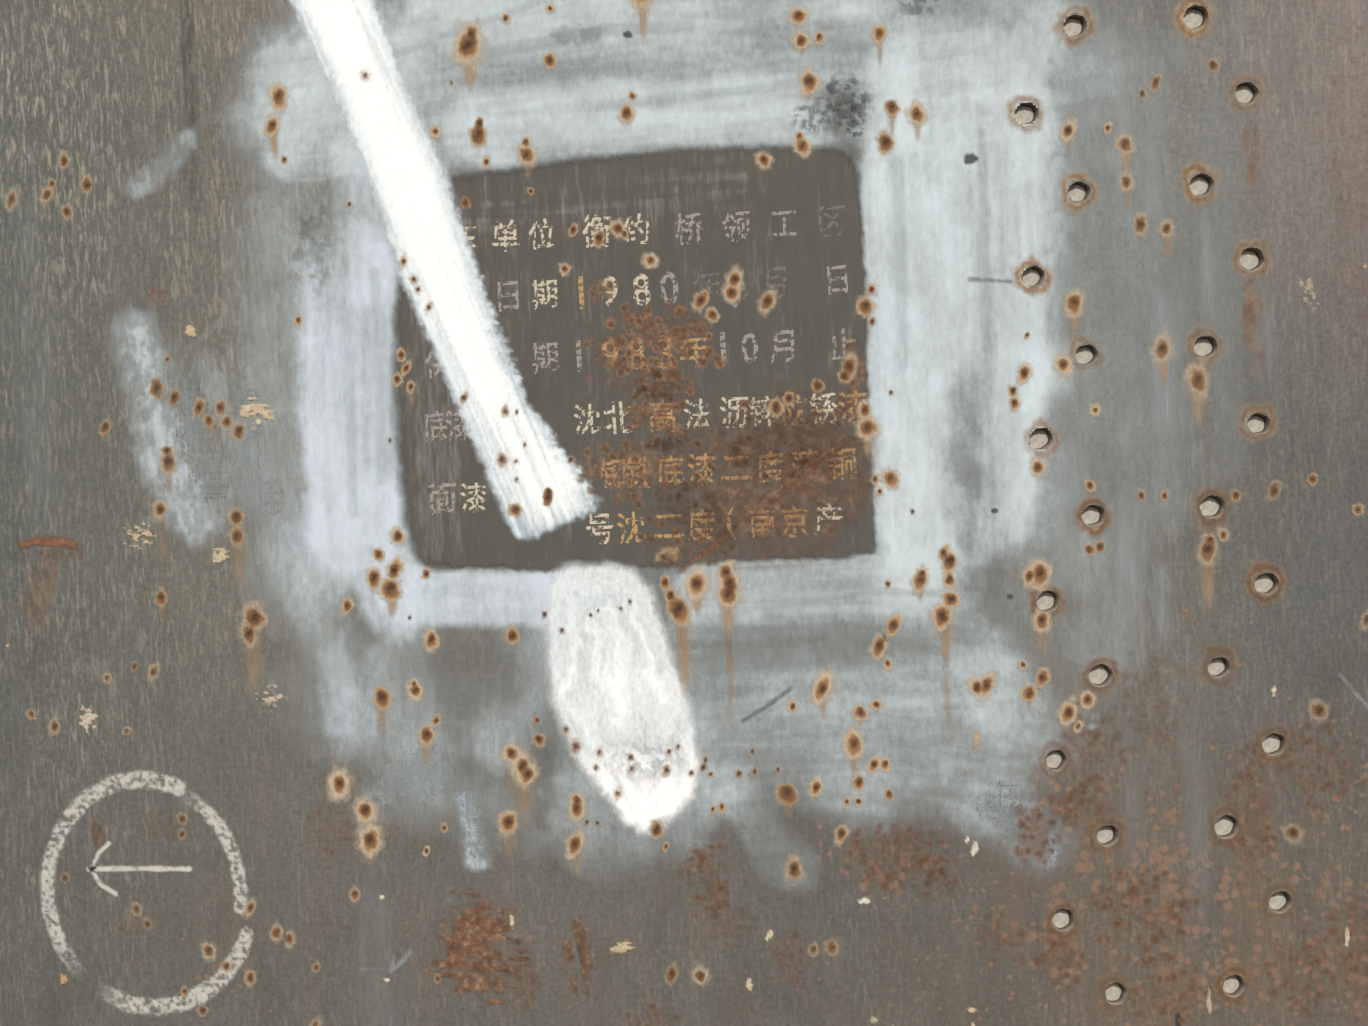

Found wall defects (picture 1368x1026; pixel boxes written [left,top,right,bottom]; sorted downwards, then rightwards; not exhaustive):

corrosion [451,22,484,84]
corrosion [1104,122,1134,190]
corrosion [856,283,876,326]
corrosion [1065,290,1084,328]
corrosion [725,340,878,477]
corrosion [1009,363,1032,411]
corrosion [1055,355,1073,377]
corrosion [569,267,742,683]
corrosion [871,470,900,496]
corrosion [1031,452,1047,476]
corrosion [328,769,382,858]
corrosion [435,892,529,1004]